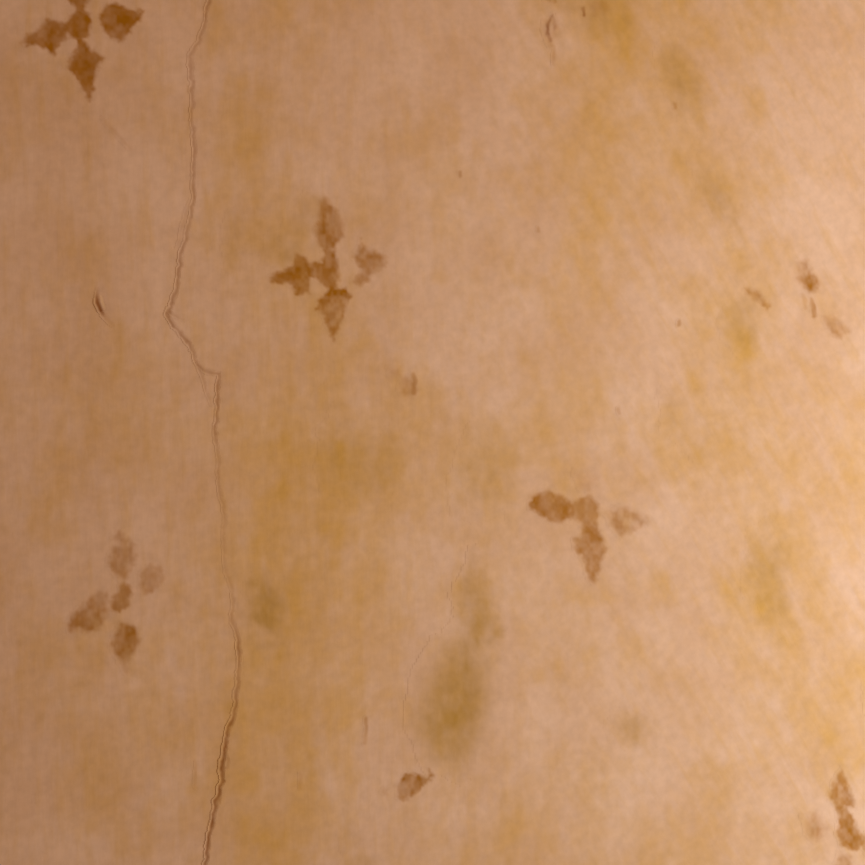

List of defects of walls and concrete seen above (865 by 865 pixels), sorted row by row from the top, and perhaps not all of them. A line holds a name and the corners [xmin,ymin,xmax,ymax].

crack [163,0,243,865]